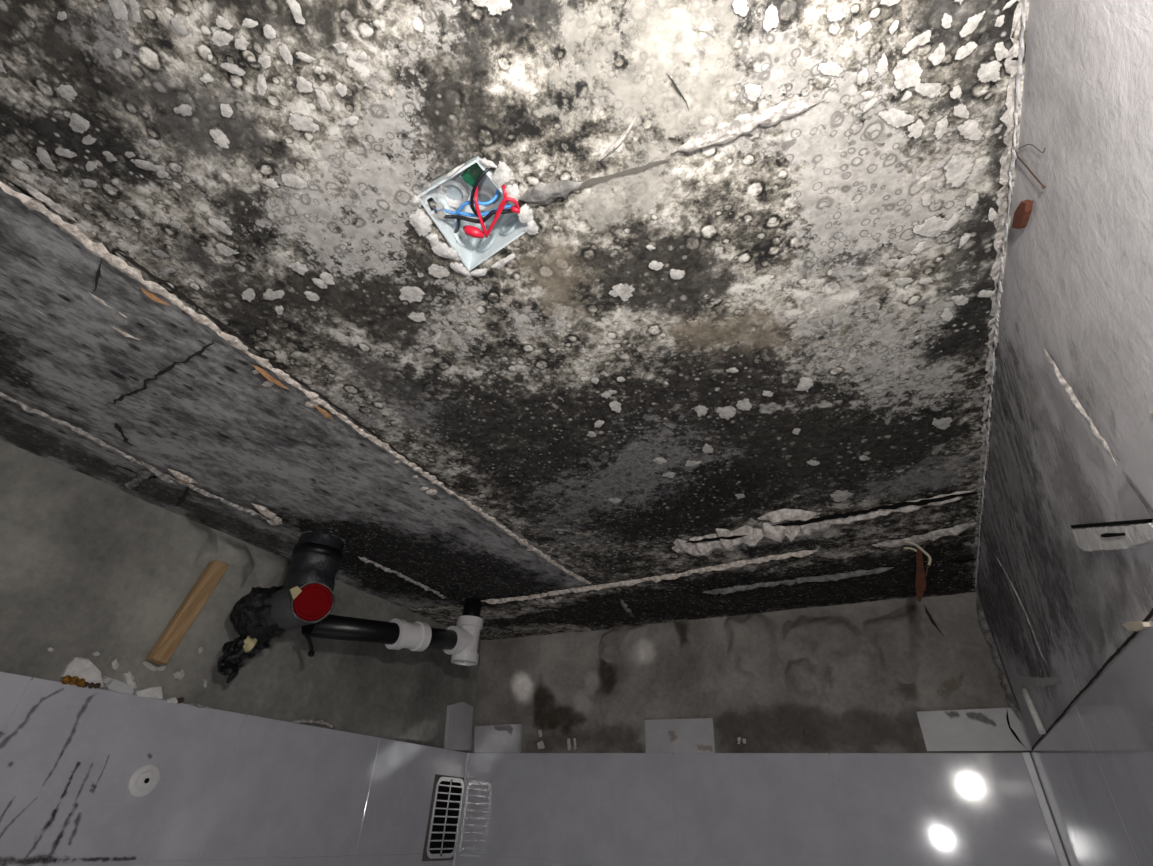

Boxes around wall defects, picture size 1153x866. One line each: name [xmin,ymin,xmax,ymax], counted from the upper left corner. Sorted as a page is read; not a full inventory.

water stain [0,0,1017,555]
crack [107,340,214,449]
peeling [587,376,625,437]
peeling [693,390,773,420]
peeling [795,375,814,392]
peeling [931,417,953,430]
peeling [652,443,714,478]
water stain [483,339,1153,707]
spalling [672,490,980,557]
water stain [255,508,565,610]
rust [903,533,932,602]
water stain [0,762,136,866]